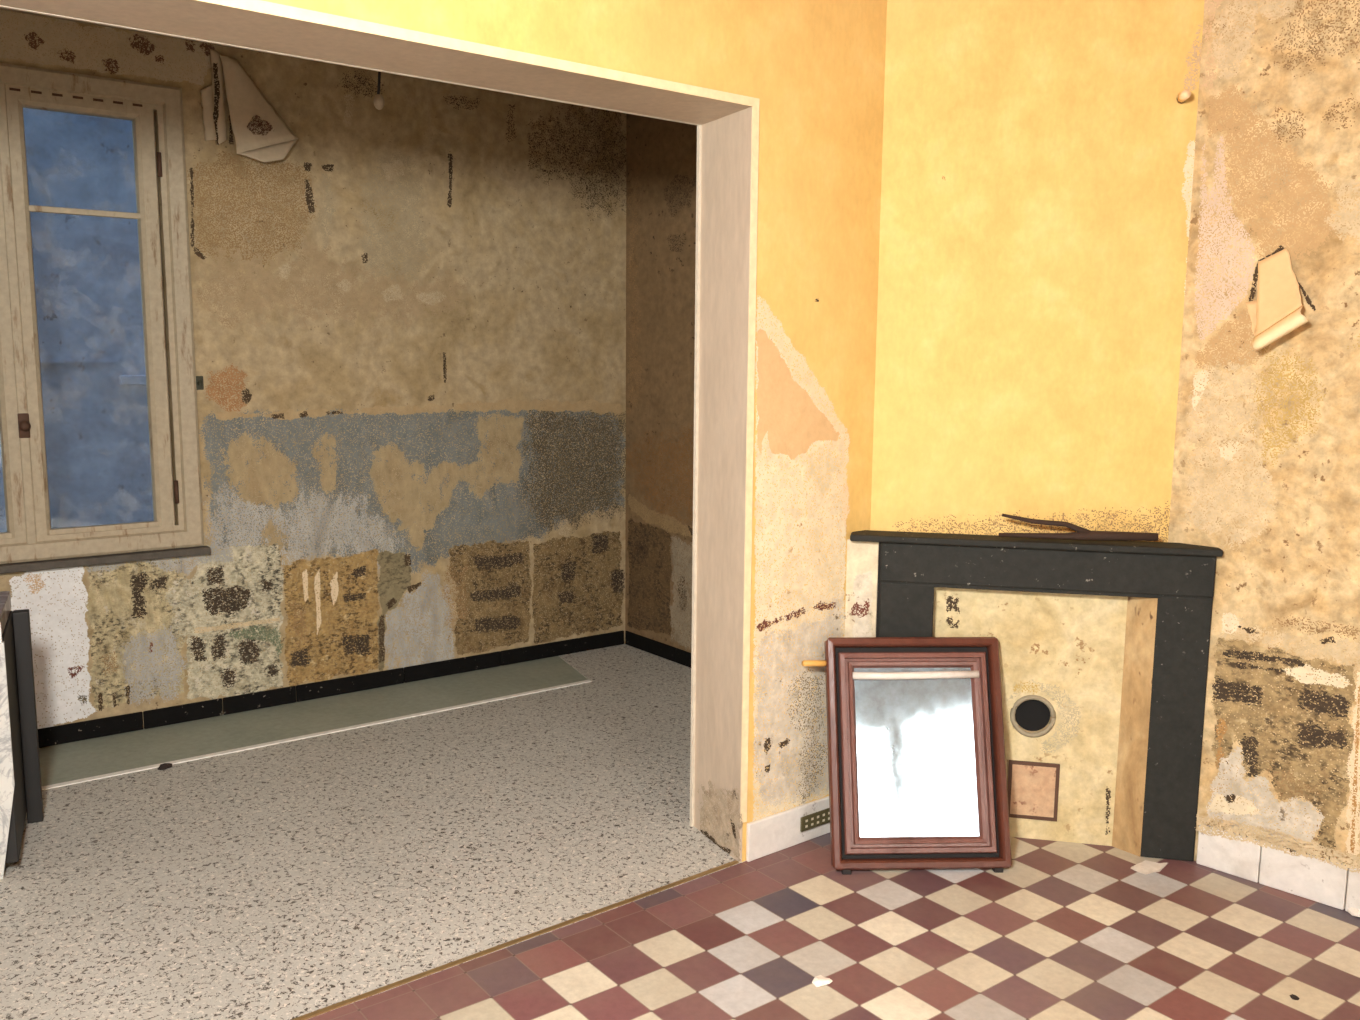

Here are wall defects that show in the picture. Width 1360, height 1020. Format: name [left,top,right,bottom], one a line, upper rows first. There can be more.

peeling [200,49,299,163]
spalling [304,162,336,249]
flaking render [669,536,693,650]
flaking render [1215,612,1360,688]
flaking render [1195,747,1360,873]